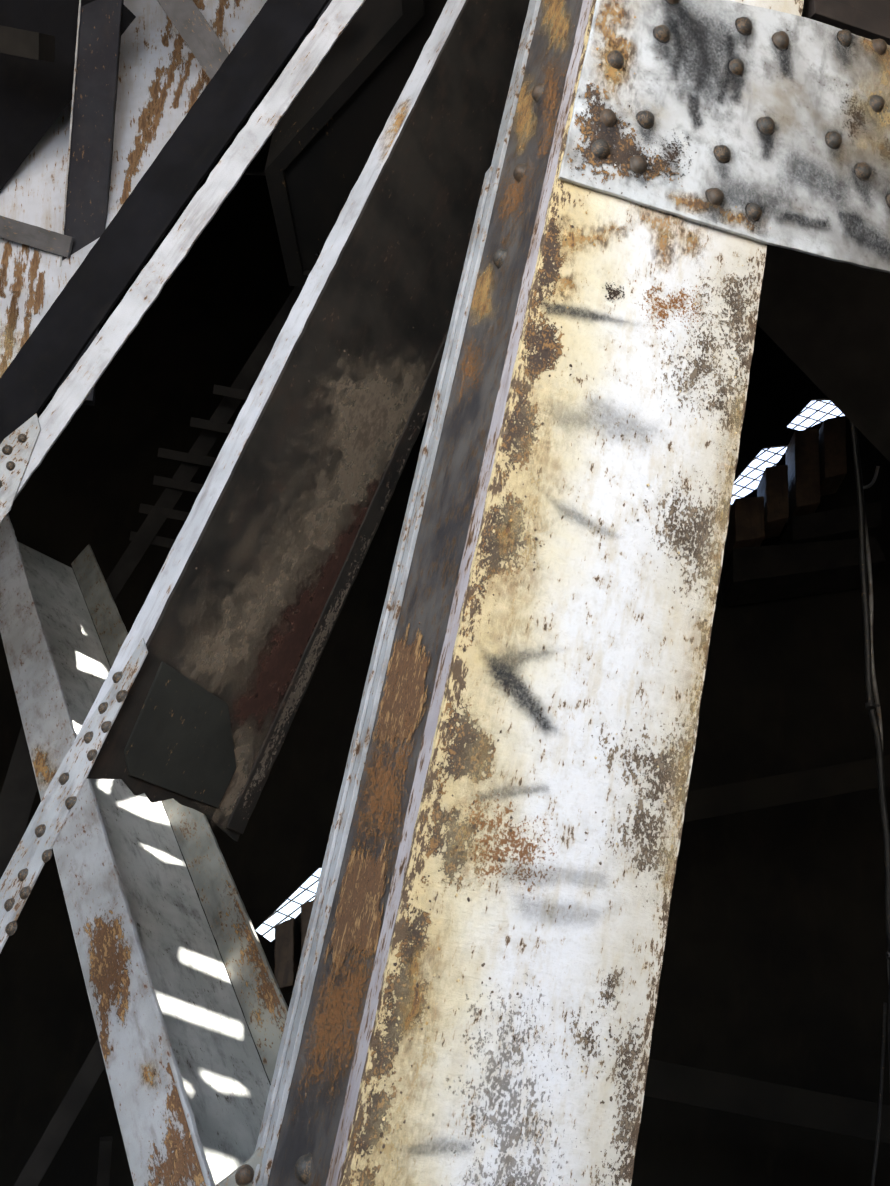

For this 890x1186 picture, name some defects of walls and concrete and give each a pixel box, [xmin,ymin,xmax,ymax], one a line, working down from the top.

corrosion [595,0,636,93]
corrosion [546,276,577,309]
corrosion [562,194,755,266]
corrosion [635,280,708,339]
corrosion [346,710,414,874]
corrosion [453,753,559,900]
corrosion [83,906,132,1064]
corrosion [142,1043,206,1186]